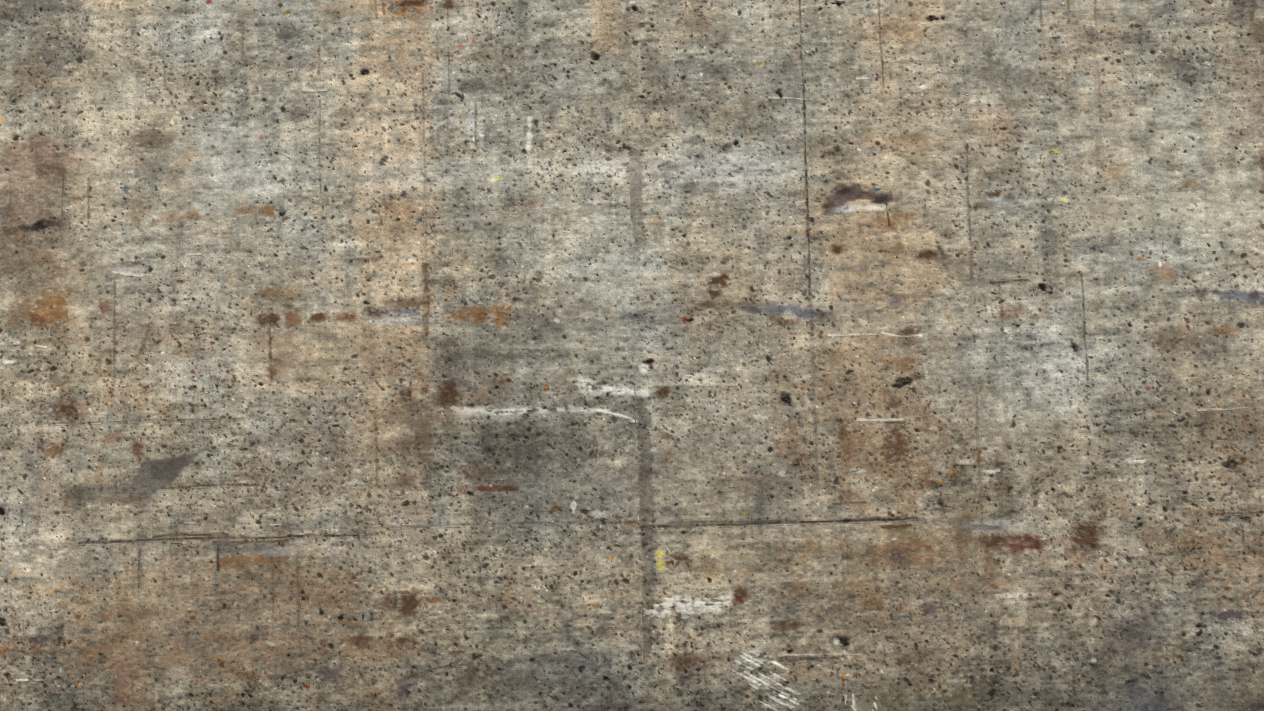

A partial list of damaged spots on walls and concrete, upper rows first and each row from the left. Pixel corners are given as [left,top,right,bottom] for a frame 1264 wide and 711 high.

rust [691,0,1108,680]
rust [0,0,521,711]
rust [651,387,674,403]
rust [664,549,696,572]
rust [630,650,767,680]
leakage [844,693,879,711]